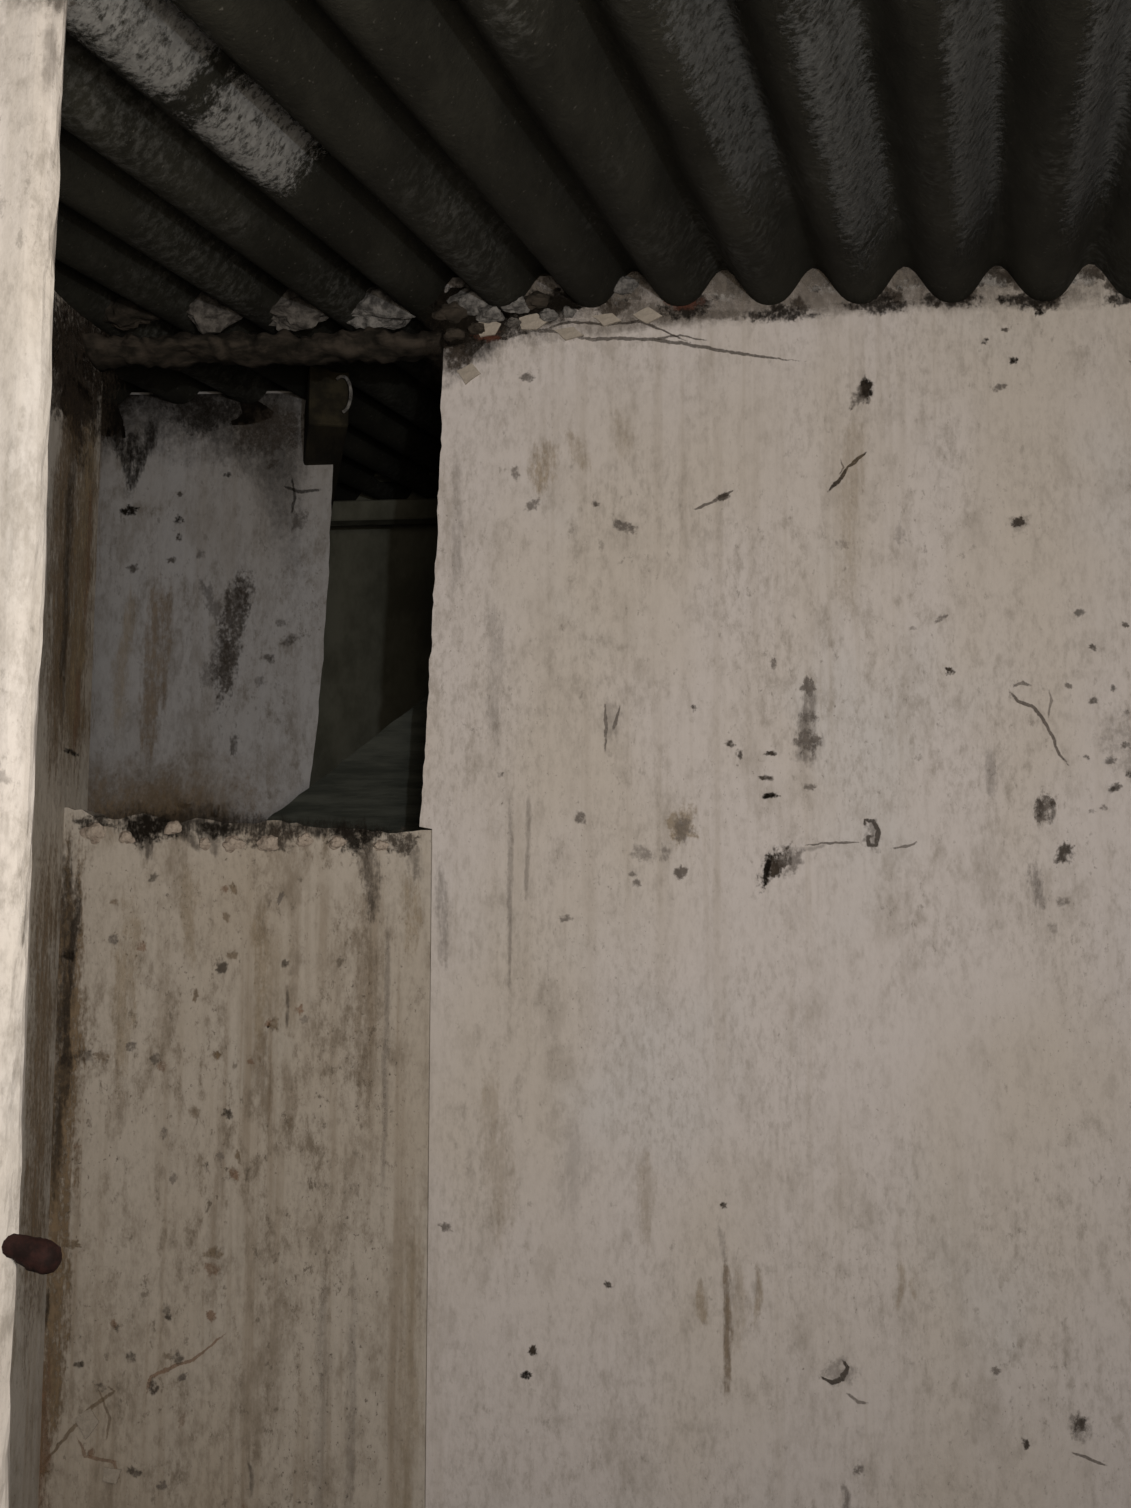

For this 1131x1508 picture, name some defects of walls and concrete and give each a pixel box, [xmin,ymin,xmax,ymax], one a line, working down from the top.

water stain [216,580,253,699]